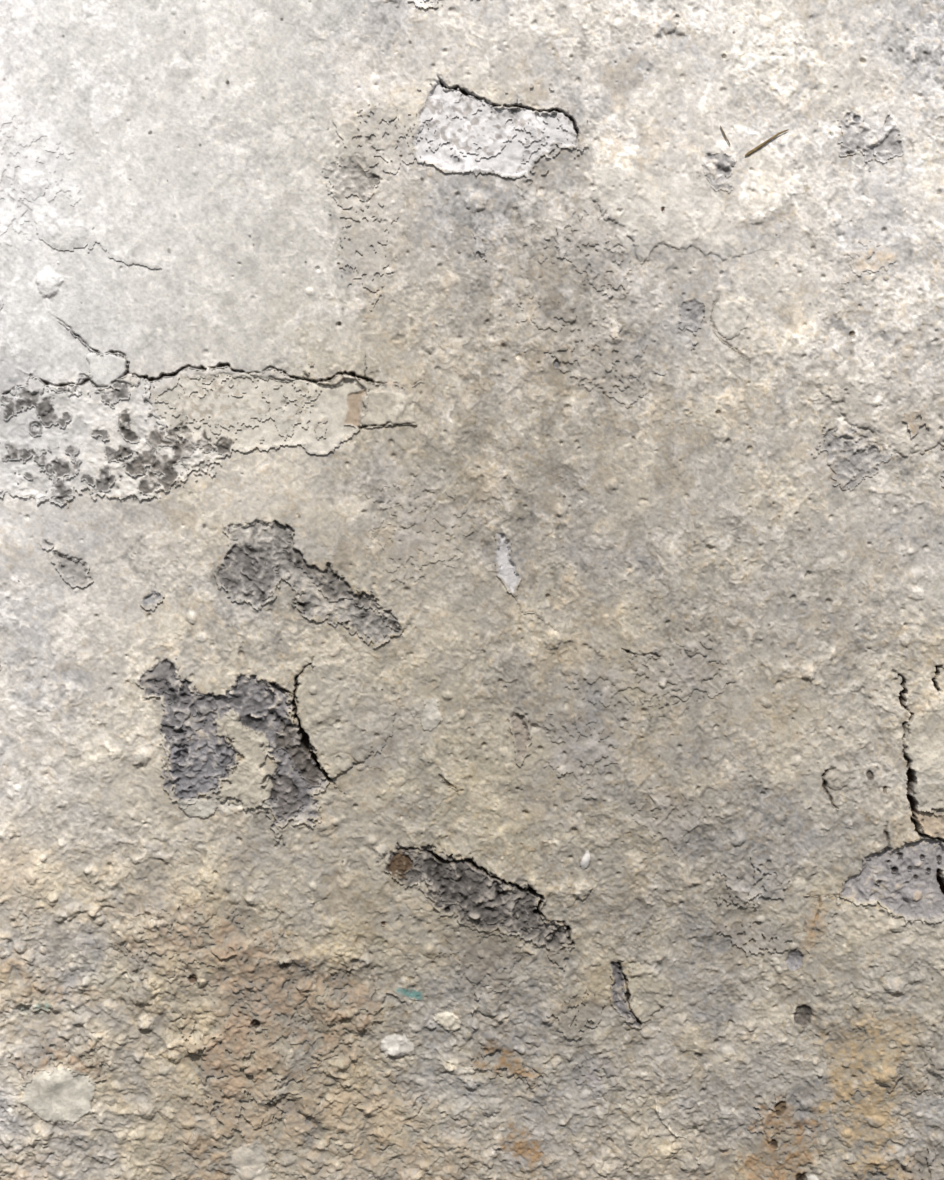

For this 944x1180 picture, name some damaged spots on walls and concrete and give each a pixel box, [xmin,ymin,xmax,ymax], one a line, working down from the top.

peeling [408,0,443,9]
peeling [412,68,589,179]
peeling [0,351,417,507]
spalling [213,517,405,648]
spalling [134,657,396,843]
spalling [377,840,575,951]
spalling [826,698,944,971]
crack [883,665,944,895]
peeling [608,959,673,1029]